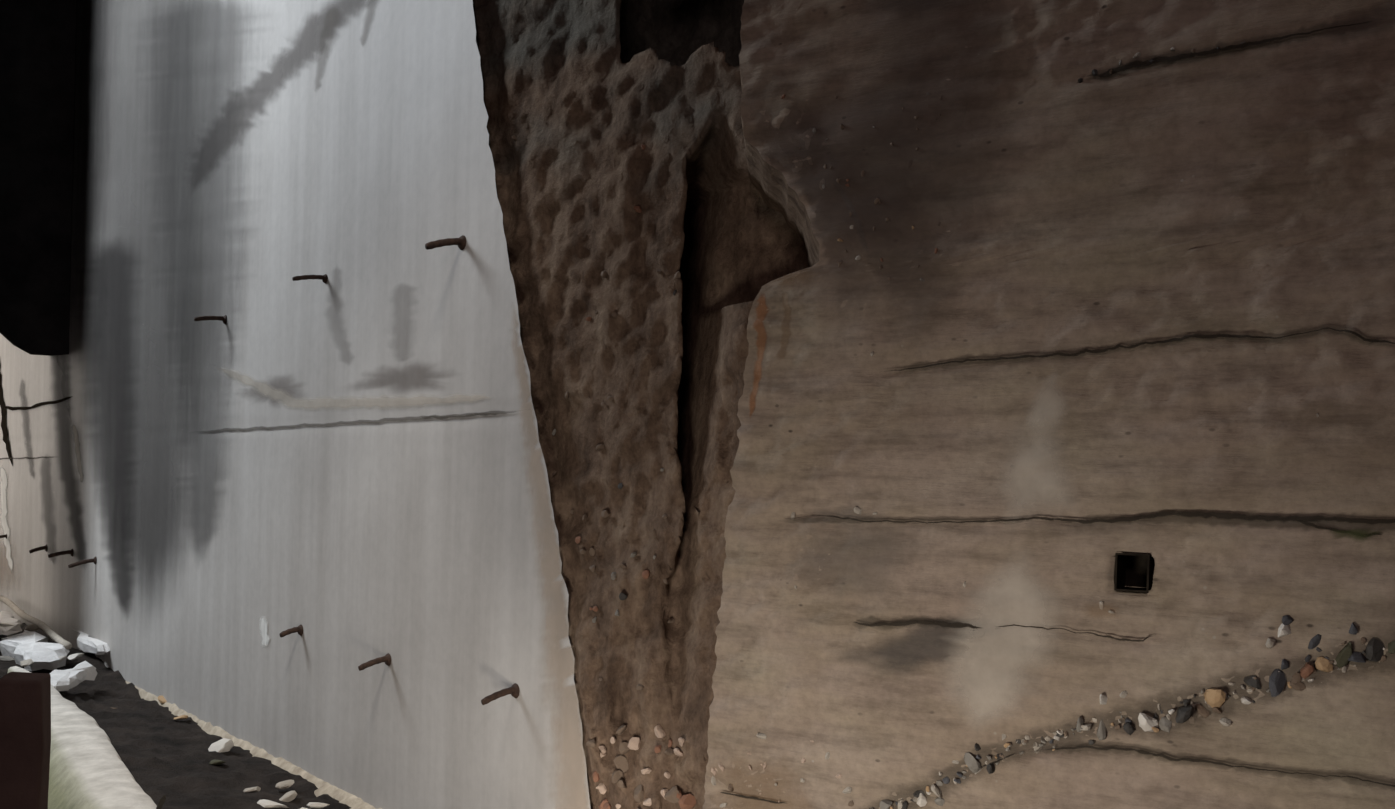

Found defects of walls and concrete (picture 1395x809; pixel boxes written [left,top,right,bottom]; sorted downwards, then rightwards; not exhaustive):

crack [1078,19,1382,83]
crack [891,328,1395,371]
leakage [55,355,84,561]
leakage [93,251,130,607]
leakage [0,468,13,570]
crack [797,511,1395,537]
crack [855,620,1151,642]
crack [1048,745,1395,787]